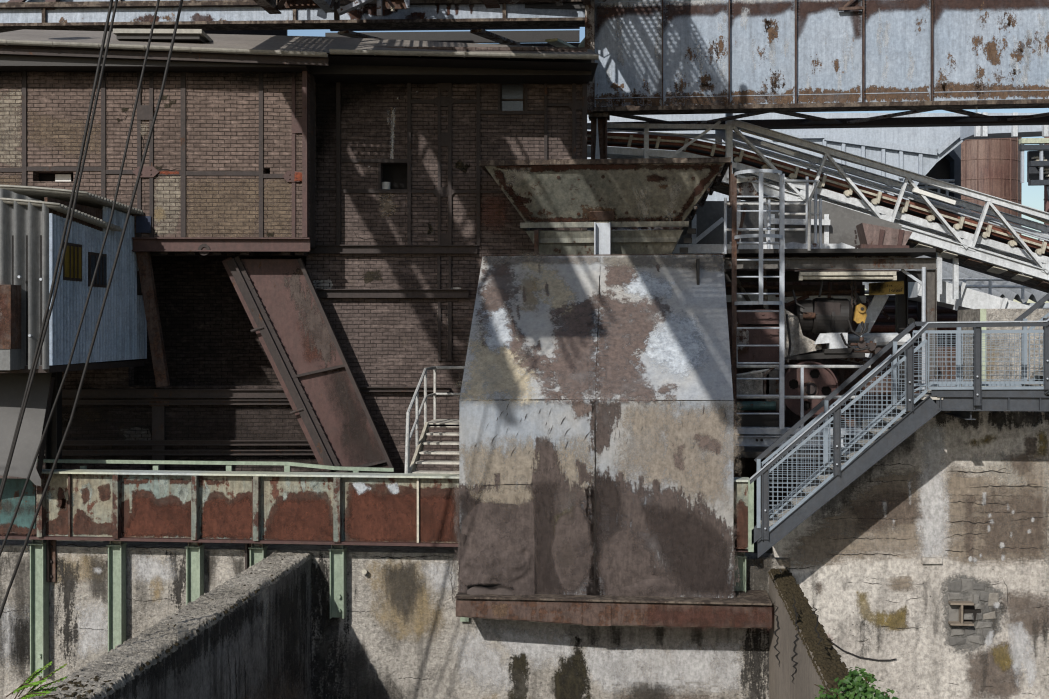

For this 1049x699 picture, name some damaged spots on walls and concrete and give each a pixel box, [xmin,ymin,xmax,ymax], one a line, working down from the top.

corrosion [130,14,173,28]
corrosion [594,0,1049,107]
corrosion [493,163,722,222]
leakage [933,411,1049,475]
leakage [533,484,563,594]
leakage [645,505,732,595]
flaking render [942,454,1049,653]
leakage [964,488,1049,559]
leakage [55,557,108,662]
leakage [95,550,403,699]
leakage [461,627,769,699]
leakage [984,592,1049,683]